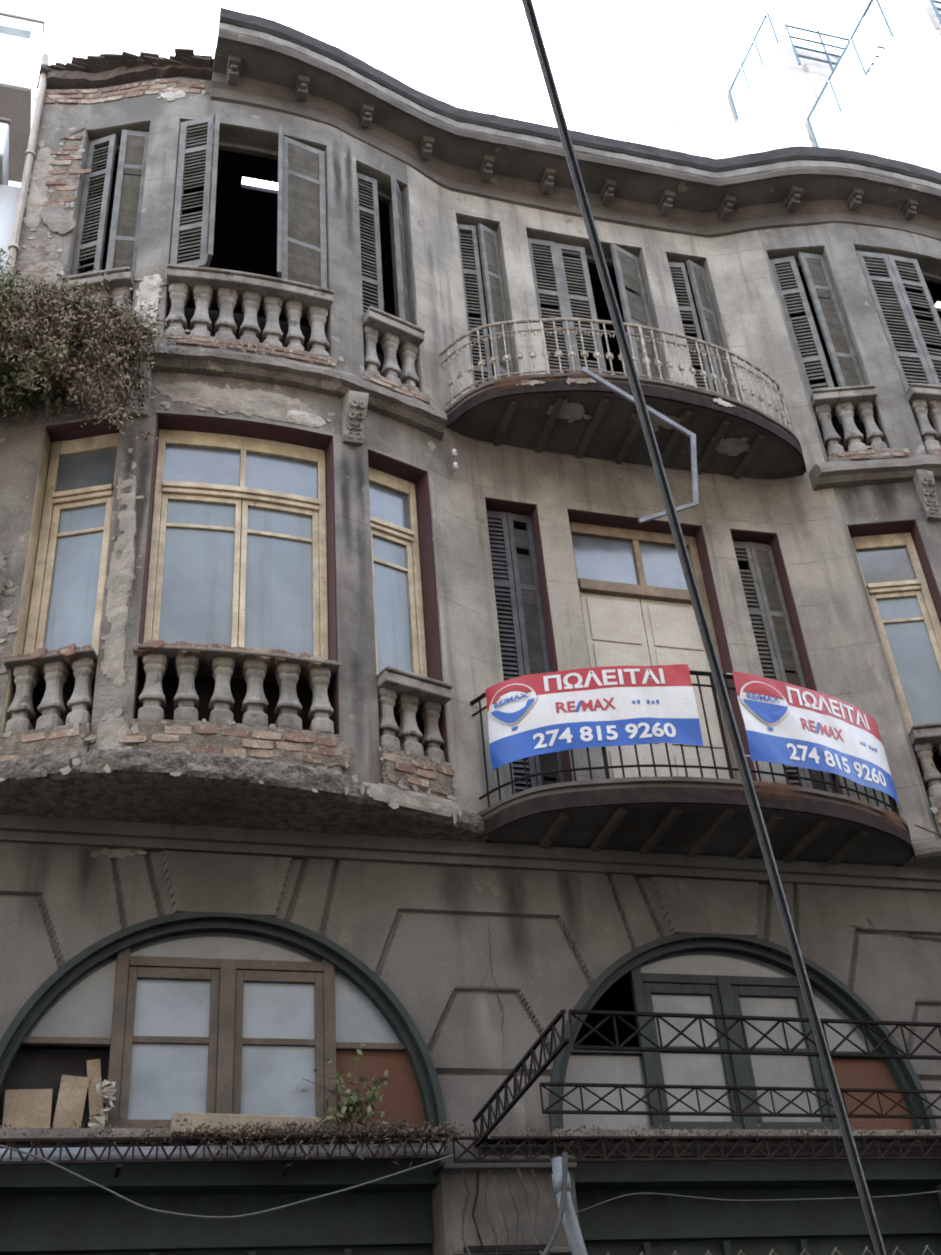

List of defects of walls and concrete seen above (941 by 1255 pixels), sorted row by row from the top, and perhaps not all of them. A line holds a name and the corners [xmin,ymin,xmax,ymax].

flaking render [13,135,92,302]
flaking render [134,274,435,404]
flaking render [836,446,910,460]
spalling [0,448,337,687]
flaking render [0,707,461,825]